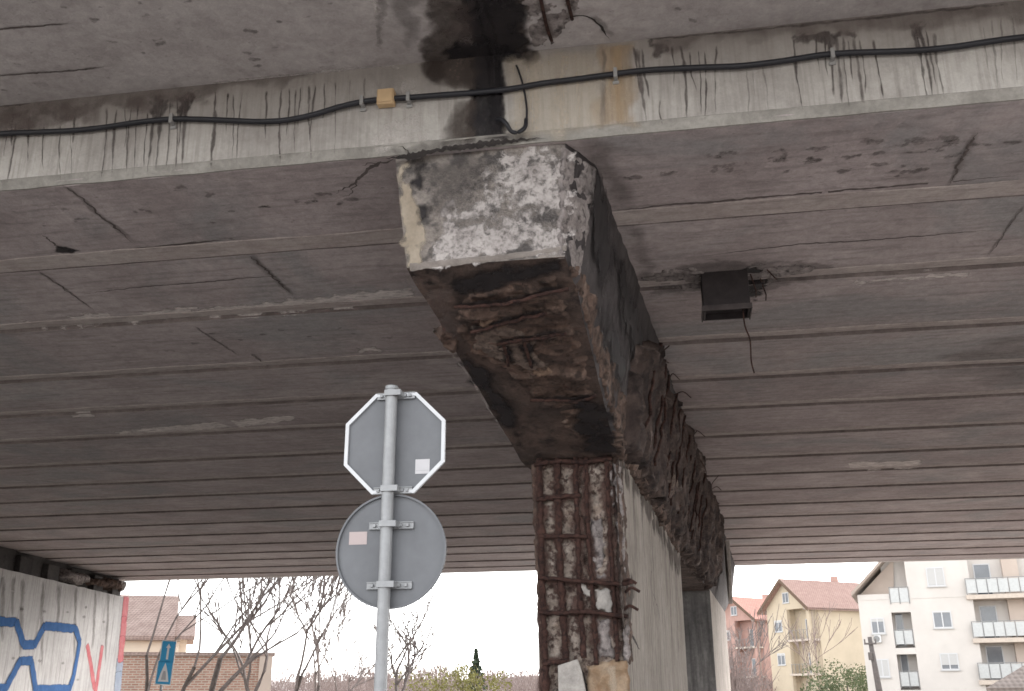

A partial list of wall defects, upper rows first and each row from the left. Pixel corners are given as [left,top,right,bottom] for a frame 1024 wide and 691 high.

spalling [522,0,580,47]
leakage [421,0,539,141]
leakage [633,39,717,113]
leakage [793,31,883,104]
leakage [102,93,195,171]
crack [338,137,542,197]
crack [614,133,1021,211]
spalling [42,235,78,253]
crack [42,188,297,307]
spalling [398,146,733,691]
spalling [58,569,126,592]
corrosion [586,660,630,691]